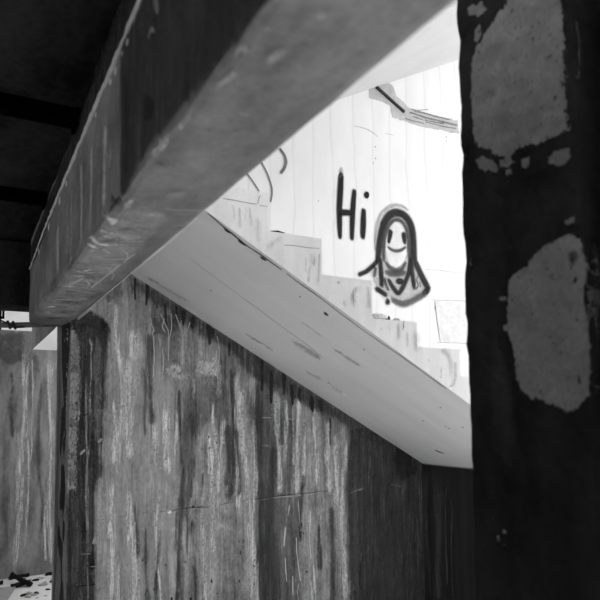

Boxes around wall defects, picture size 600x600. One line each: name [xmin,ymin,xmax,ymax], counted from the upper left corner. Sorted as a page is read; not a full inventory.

peeling [468,0,571,176]
peeling [499,234,600,415]
water stain [0,278,454,600]